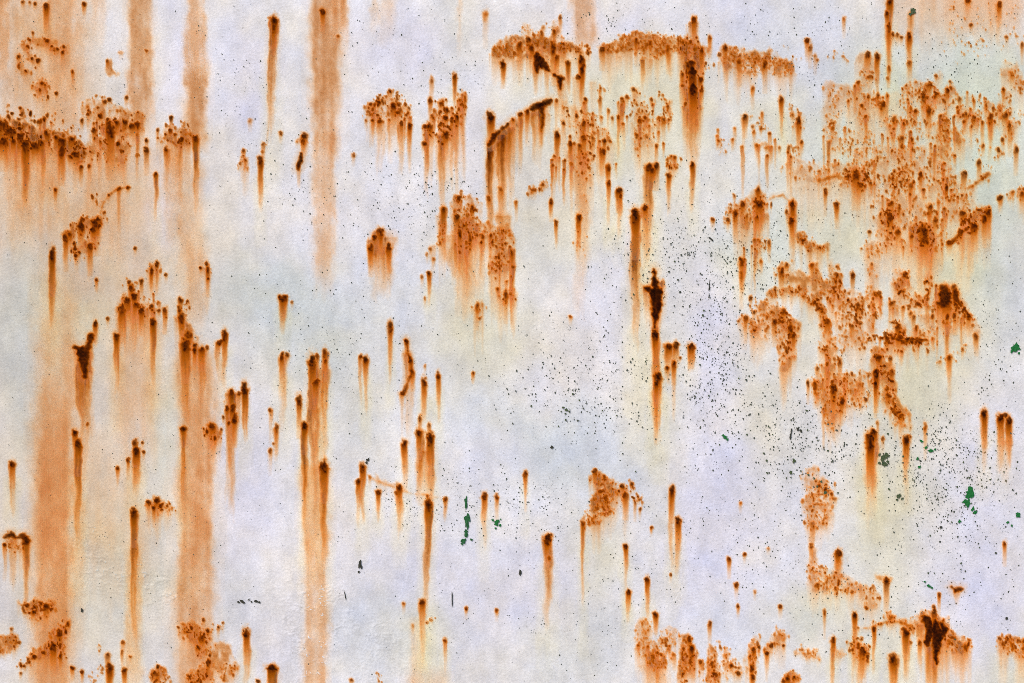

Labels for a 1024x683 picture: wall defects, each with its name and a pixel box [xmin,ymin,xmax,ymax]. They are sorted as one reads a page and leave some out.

rust [0,31,206,191]
rust [362,72,467,168]
rust [49,193,108,306]
rust [420,187,516,304]
rust [492,14,794,417]
rust [710,50,1024,483]
rust [71,260,228,505]
rust [129,382,249,589]
rust [295,348,330,525]
rust [580,468,643,554]
rust [635,611,789,683]
rust [799,468,973,681]